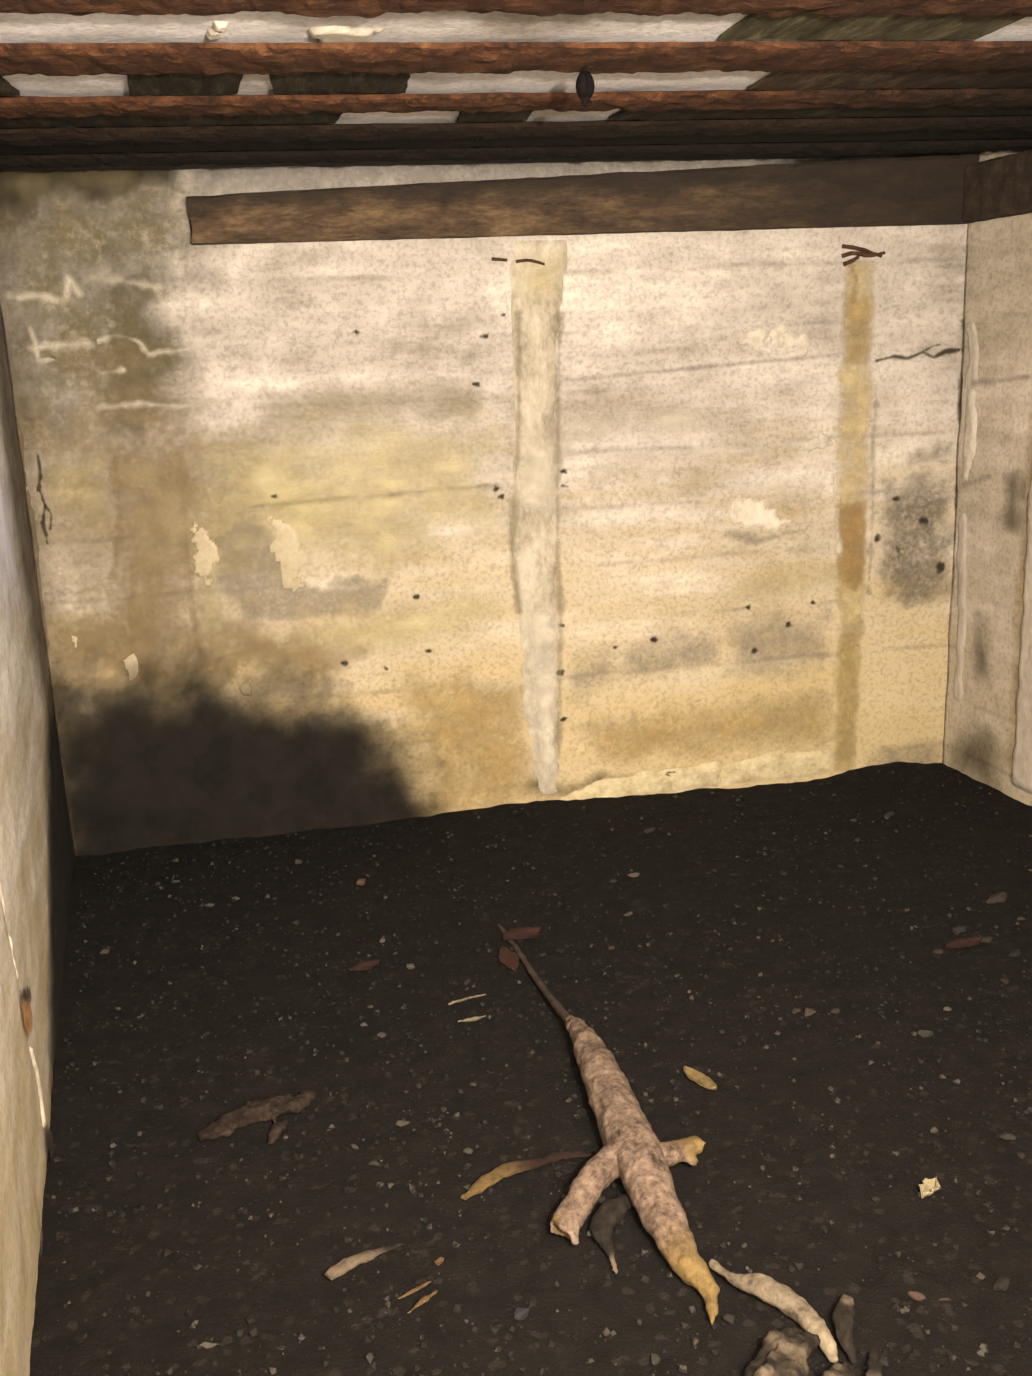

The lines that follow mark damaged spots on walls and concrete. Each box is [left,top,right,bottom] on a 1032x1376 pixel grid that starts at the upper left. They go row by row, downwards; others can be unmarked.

crack [876,320,965,422]
peeling [189,515,382,616]
rust [834,263,874,769]
crack [951,484,959,587]